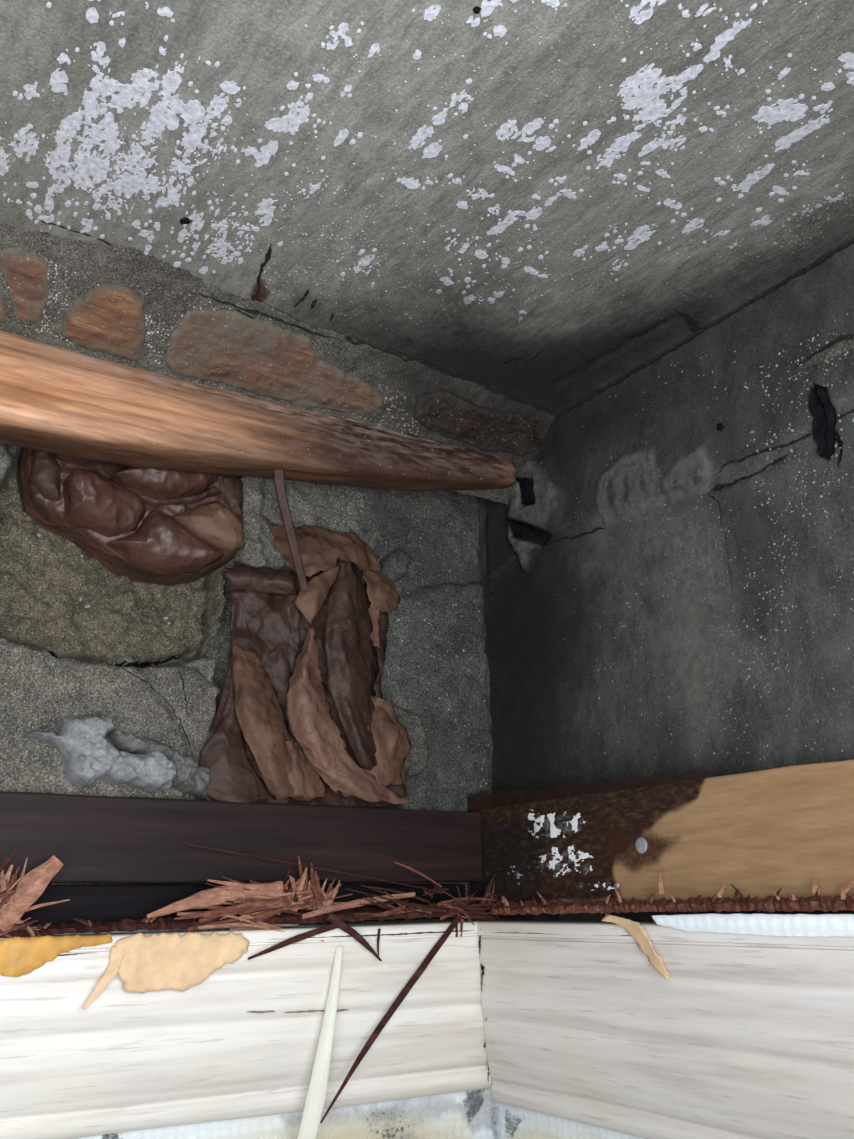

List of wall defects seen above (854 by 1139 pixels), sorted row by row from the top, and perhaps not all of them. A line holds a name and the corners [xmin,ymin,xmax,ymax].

crack [193,244,438,371]
spalling [808,383,843,466]
spalling [516,477,536,506]
spalling [505,518,552,545]
crack [488,527,606,595]
crack [708,433,812,604]
leakage [367,1111,415,1139]
leakage [465,1089,484,1122]